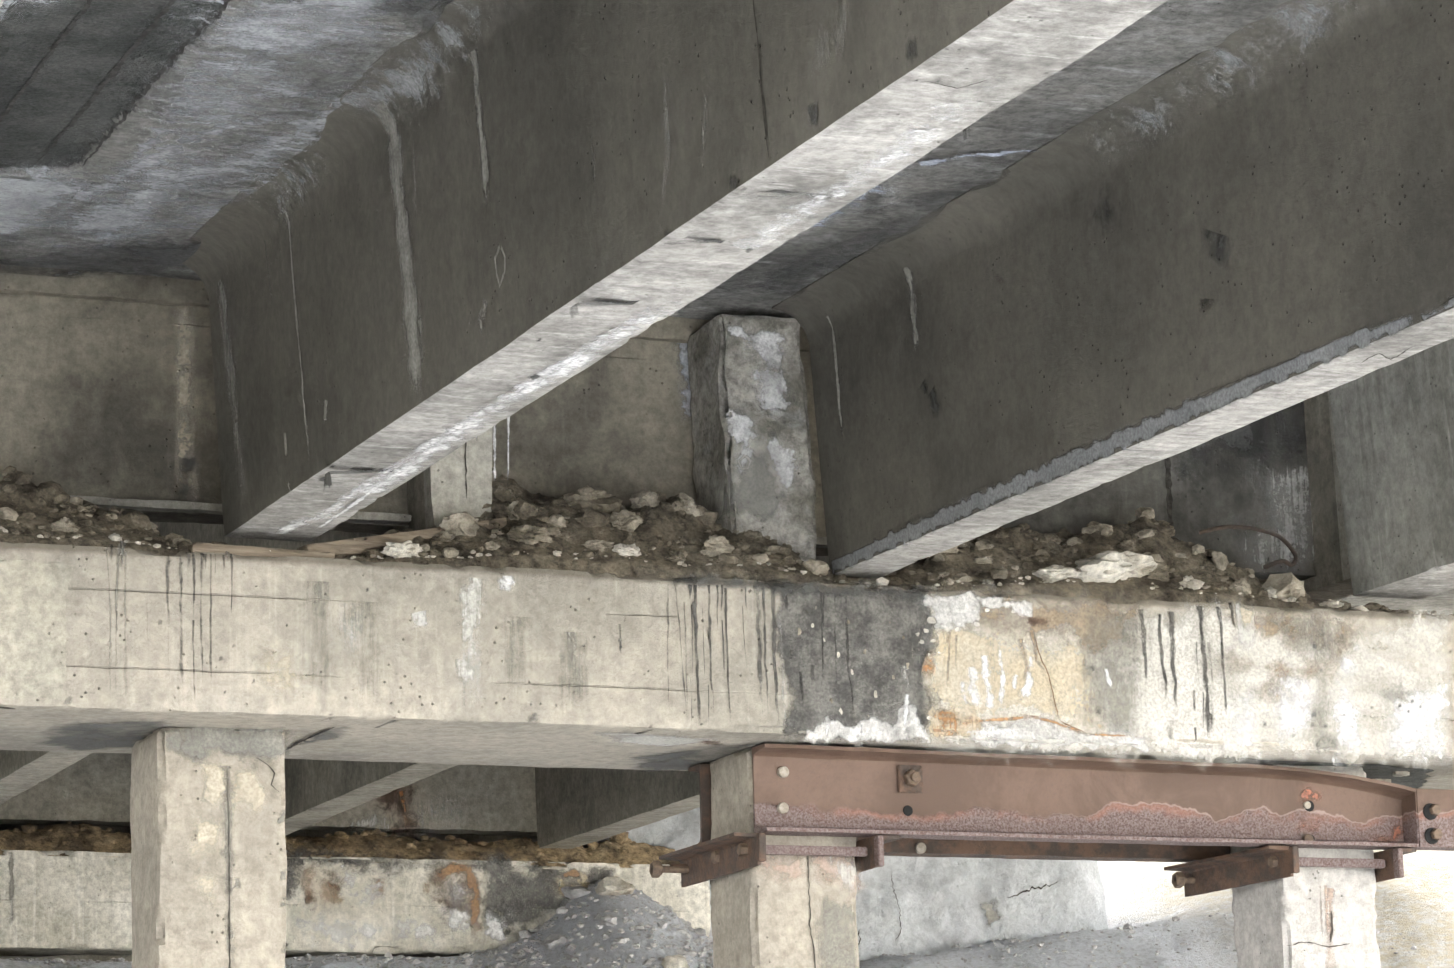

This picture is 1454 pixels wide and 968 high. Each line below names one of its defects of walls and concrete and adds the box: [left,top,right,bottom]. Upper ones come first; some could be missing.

crack [753,0,769,157]
damp [0,0,489,435]
damp [218,279,242,463]
damp [107,541,127,632]
damp [166,551,233,690]
spalling [916,591,1168,752]
damp [667,574,1449,762]
damp [286,847,402,897]
rust [425,863,481,929]
damp [398,855,614,940]
rust [762,856,861,896]